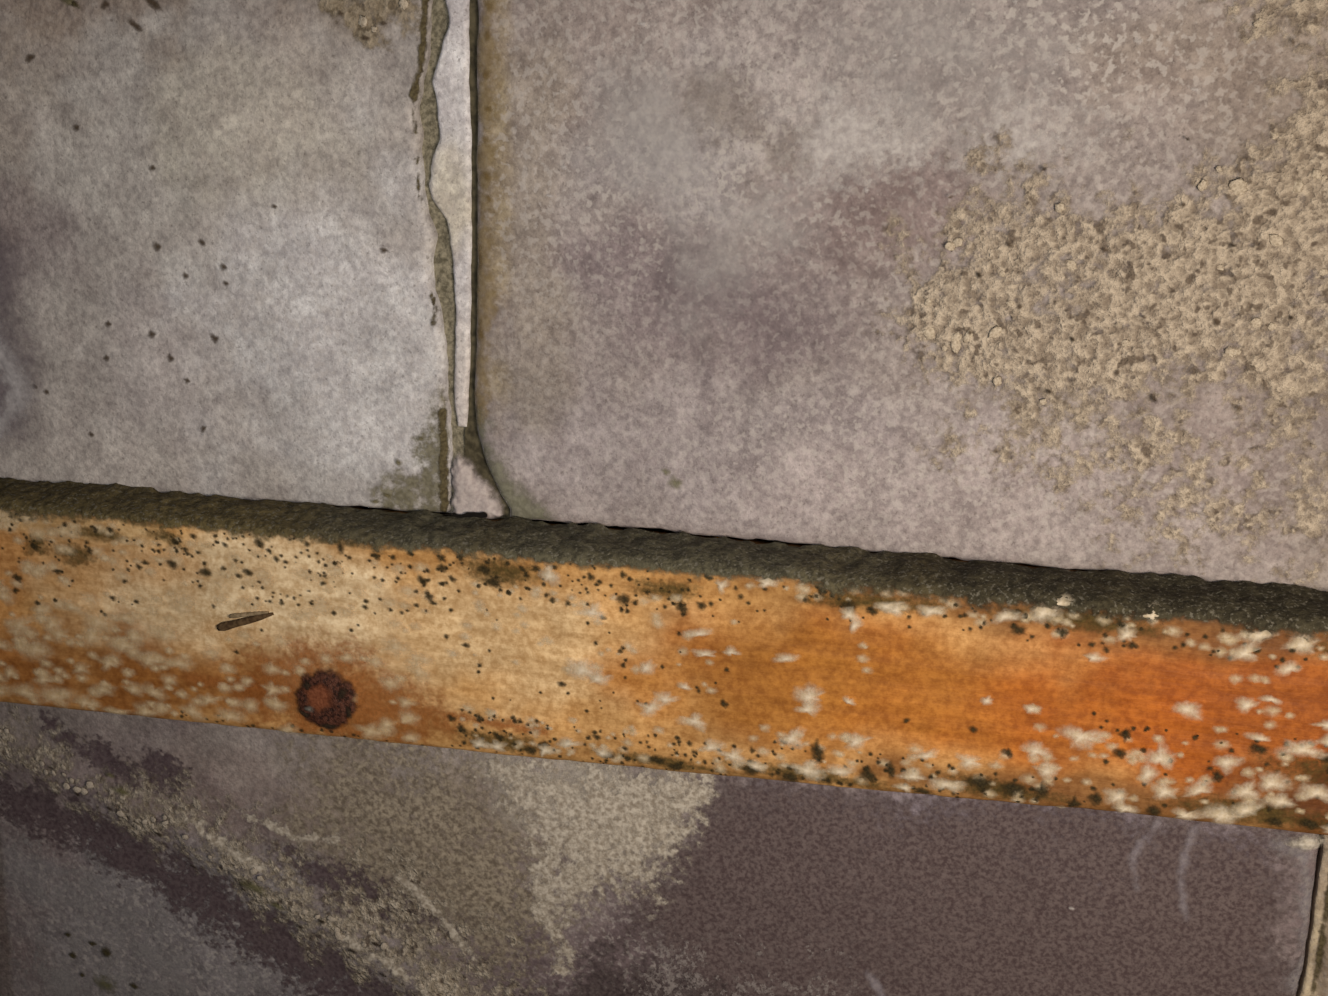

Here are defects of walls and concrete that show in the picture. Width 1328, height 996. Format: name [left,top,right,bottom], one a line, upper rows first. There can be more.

rust [187,641,468,742]
damp [0,509,1328,996]